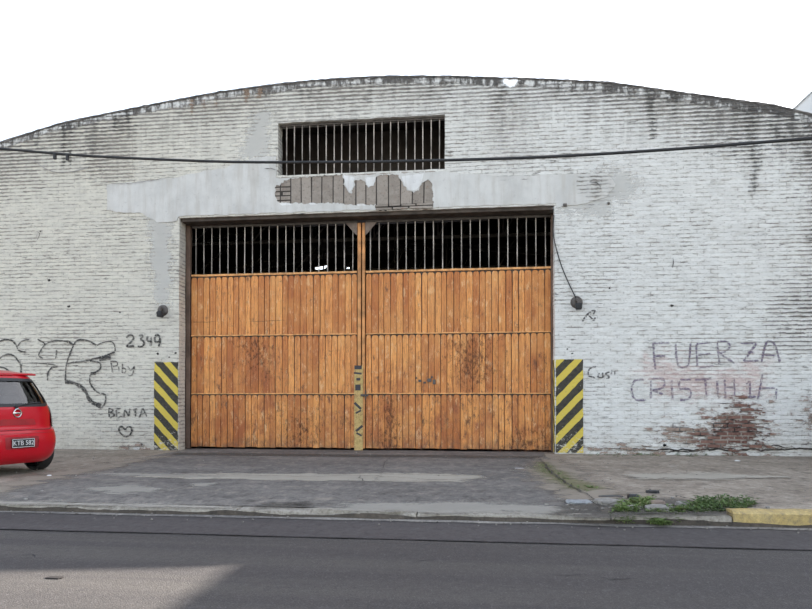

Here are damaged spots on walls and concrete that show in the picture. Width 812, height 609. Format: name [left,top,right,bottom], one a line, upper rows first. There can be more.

damp [538,80,812,196]
spalling [275,171,435,211]
peeling [580,386,784,456]
peeling [790,395,812,430]